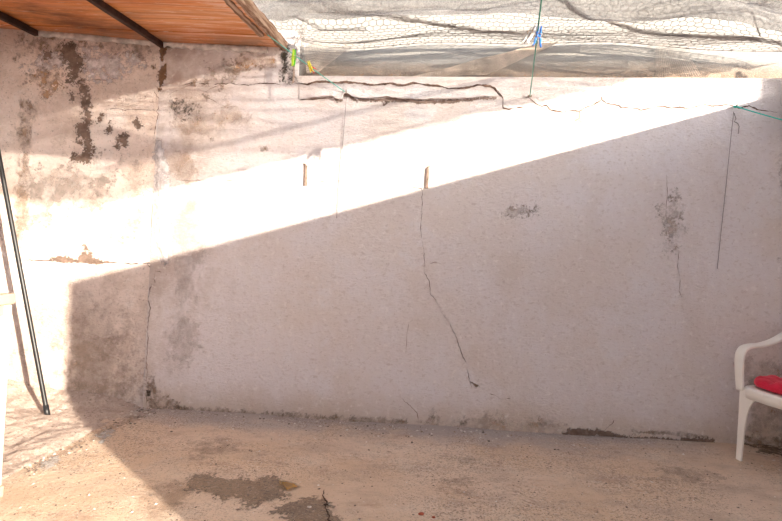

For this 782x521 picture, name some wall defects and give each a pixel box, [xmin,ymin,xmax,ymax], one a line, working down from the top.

leakage [18,101,33,144]
crack [112,77,280,135]
leakage [16,154,116,237]
crack [23,244,160,405]
crack [447,320,510,399]